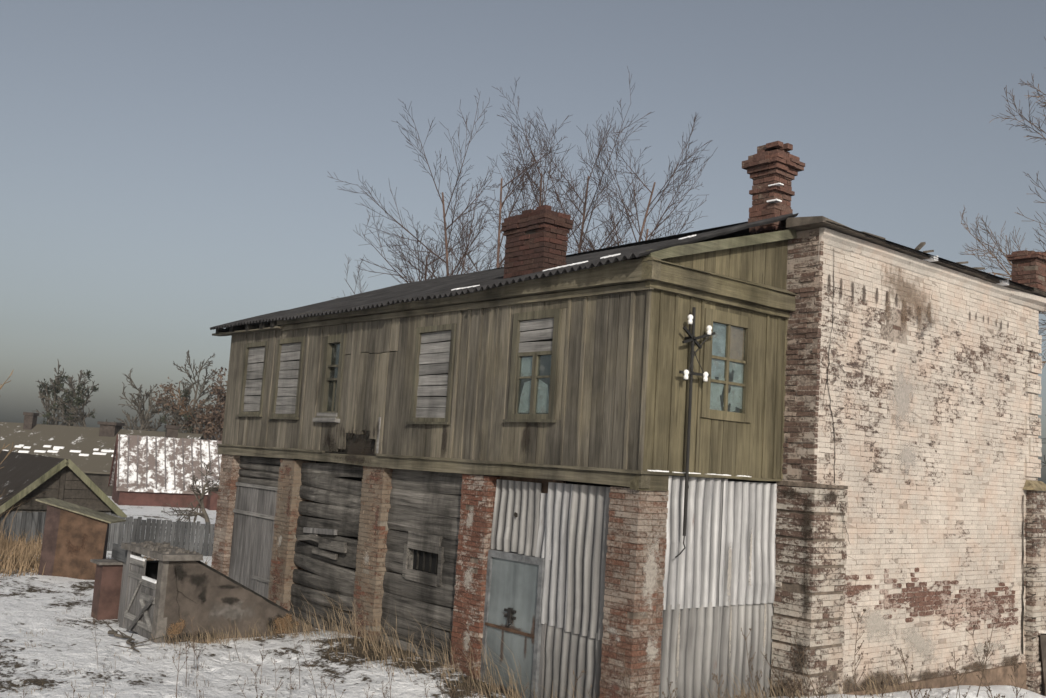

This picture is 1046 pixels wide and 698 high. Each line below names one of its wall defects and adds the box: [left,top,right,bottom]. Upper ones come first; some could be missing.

peeling [829,308,877,394]
peeling [897,305,961,363]
spalling [845,568,1019,635]